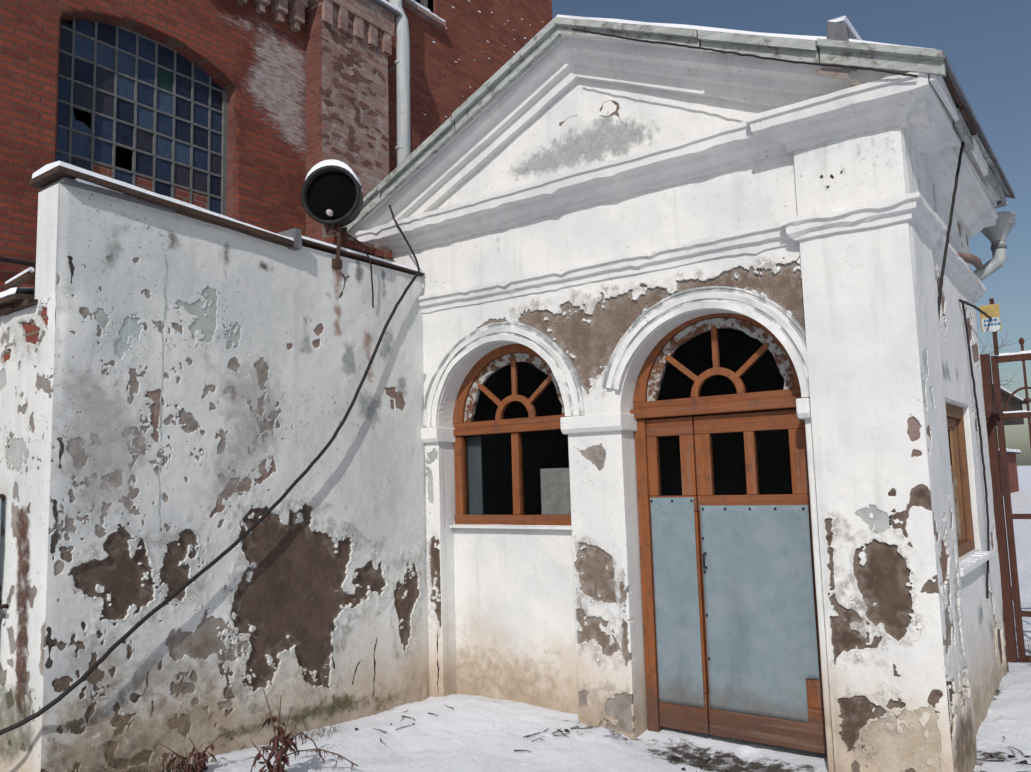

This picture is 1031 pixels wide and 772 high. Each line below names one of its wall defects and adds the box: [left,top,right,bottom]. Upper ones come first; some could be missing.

spalling [309,0,389,168]
leakage [514,117,651,174]
peeling [312,323,324,348]
peeling [385,387,406,411]
flaking render [477,257,805,394]
peeling [965,307,979,363]
flaking render [0,286,293,770]
flaking render [157,500,441,739]
peeling [426,449,438,504]
flaking render [575,540,631,667]
flaking render [825,484,963,664]
flaking render [838,672,967,772]